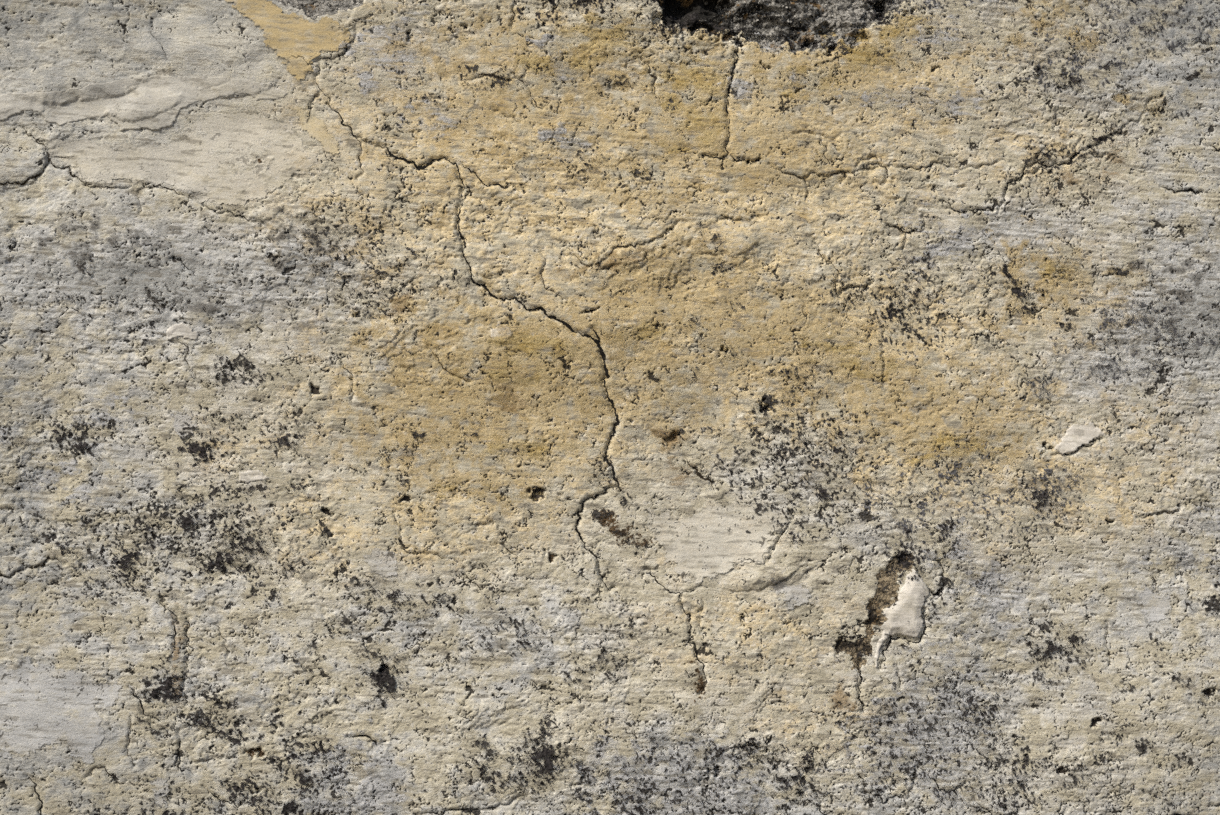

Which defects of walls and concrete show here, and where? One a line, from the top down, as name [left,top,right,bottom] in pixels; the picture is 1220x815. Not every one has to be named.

flaking render [652,0,914,57]
crack [0,127,267,226]
crack [286,37,760,595]
crack [731,519,792,571]
crack [647,568,706,693]
peeling [834,552,931,673]